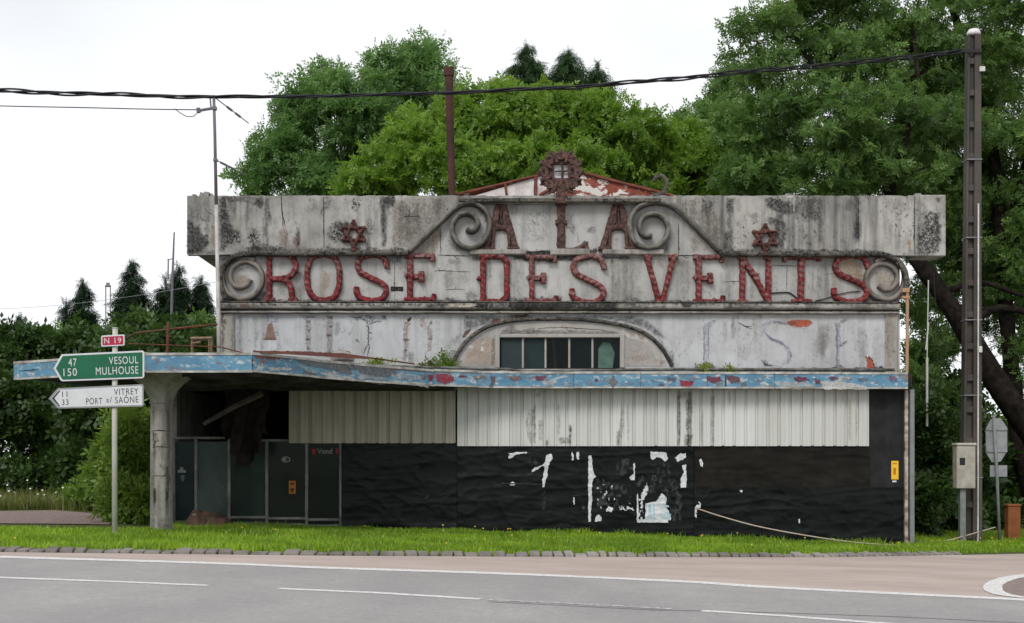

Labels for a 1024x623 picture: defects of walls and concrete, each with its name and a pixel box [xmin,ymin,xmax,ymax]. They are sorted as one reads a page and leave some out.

leakage [766,196,841,252]
mould [918,199,941,253]
leakage [187,197,657,342]
crack [354,317,378,357]
peeling [762,320,812,368]
peeling [774,323,875,390]